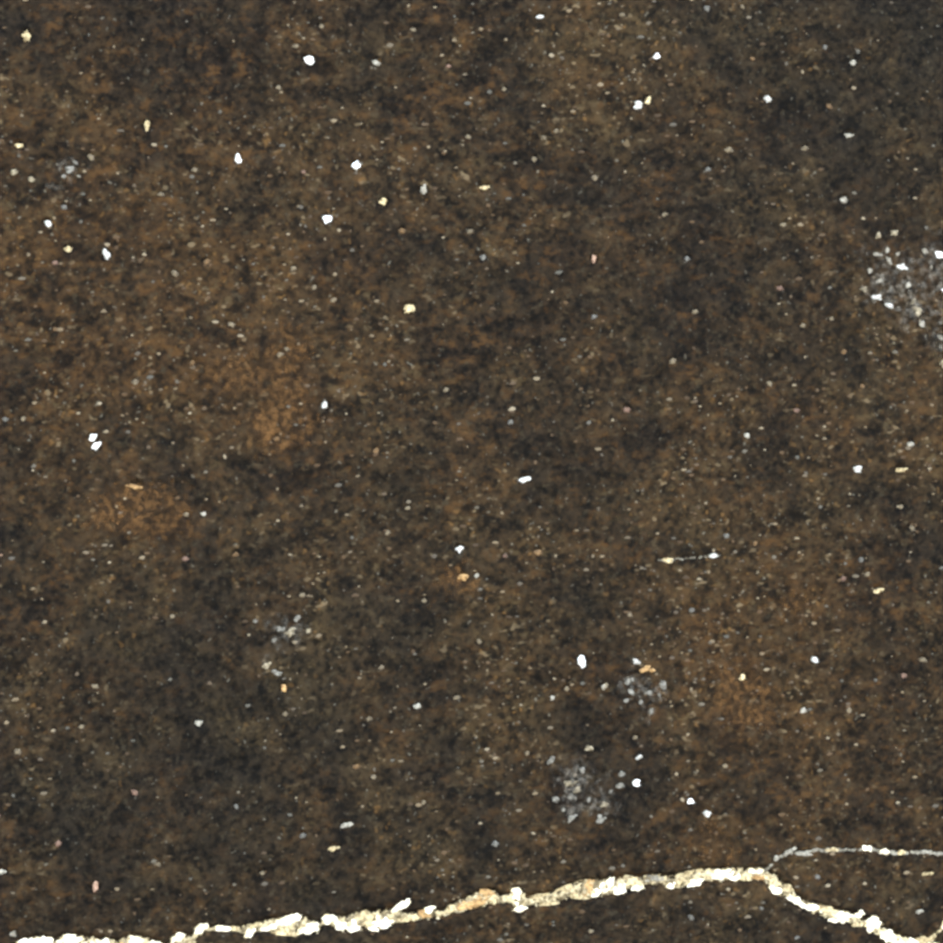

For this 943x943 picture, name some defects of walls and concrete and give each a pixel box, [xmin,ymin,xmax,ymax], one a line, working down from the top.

crack [16,845,943,943]